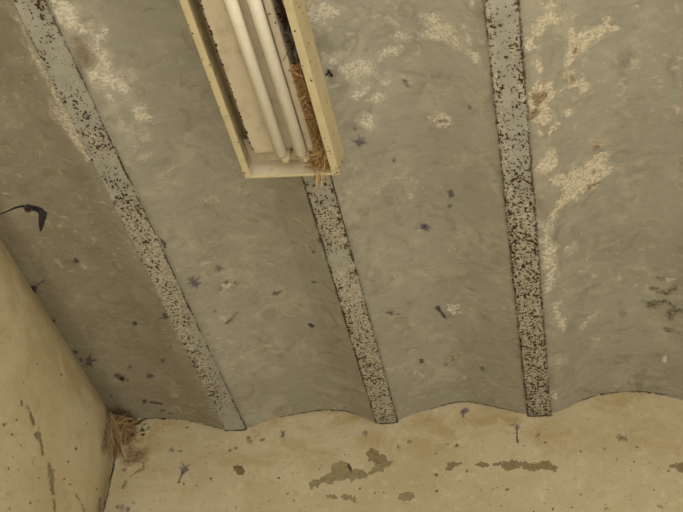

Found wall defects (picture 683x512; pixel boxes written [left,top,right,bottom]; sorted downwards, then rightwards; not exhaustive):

flaking render [309,448,393,489]
flaking render [475,460,558,472]